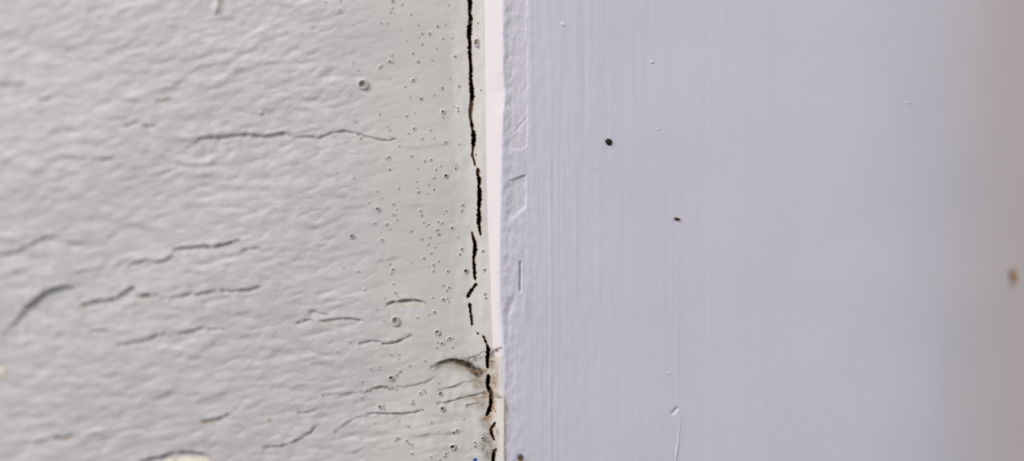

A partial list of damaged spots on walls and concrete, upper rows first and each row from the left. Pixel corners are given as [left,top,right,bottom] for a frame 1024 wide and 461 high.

crack [196,128,396,144]
crack [263,0,498,461]
crack [81,238,259,348]
rust [440,347,506,421]